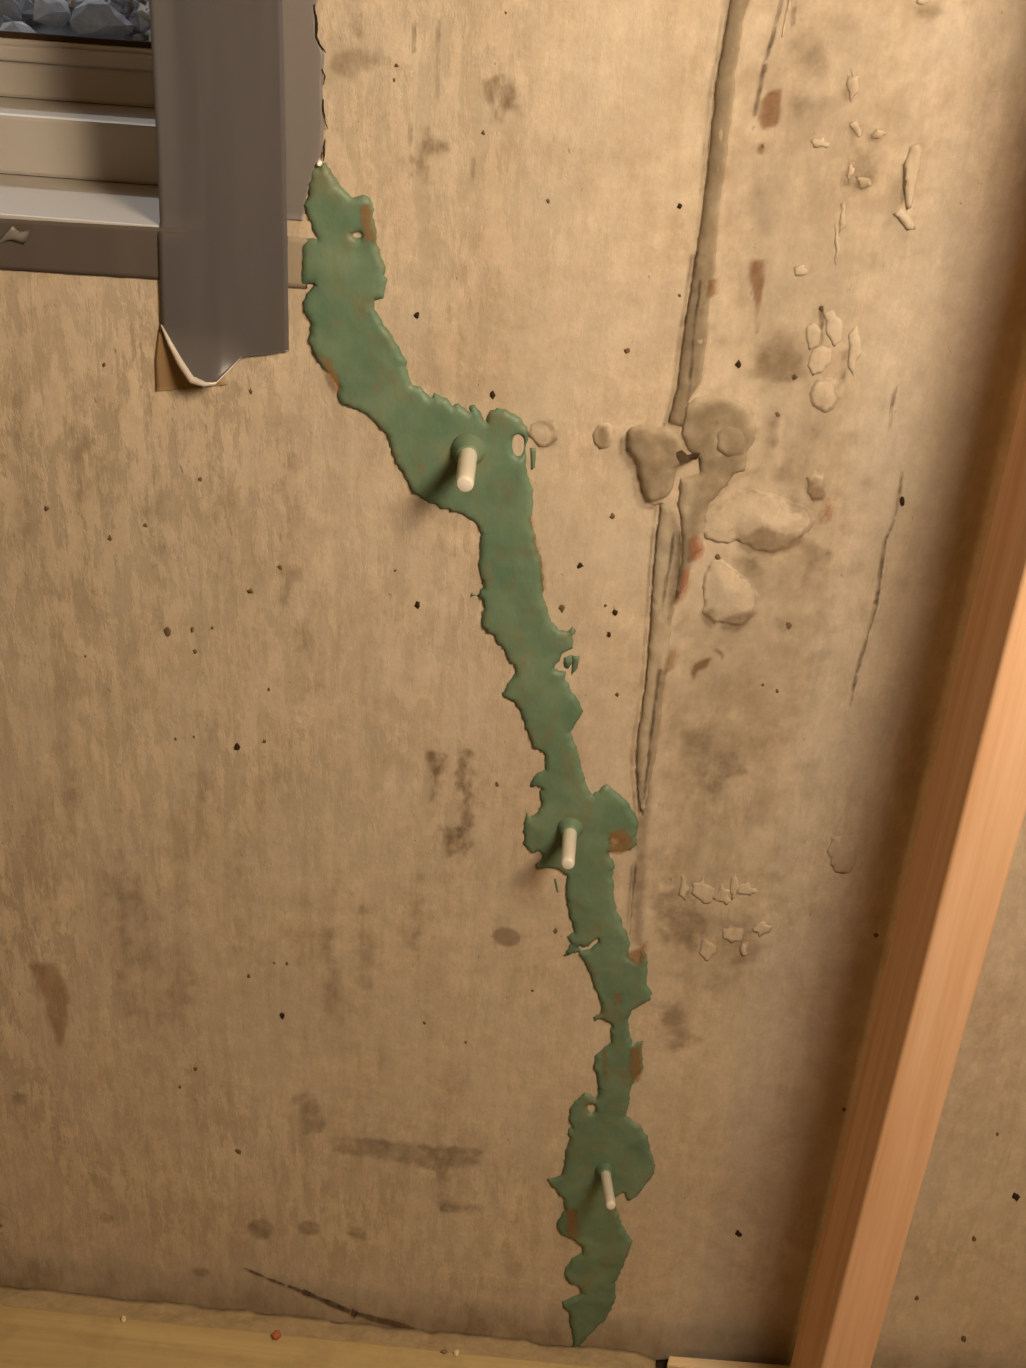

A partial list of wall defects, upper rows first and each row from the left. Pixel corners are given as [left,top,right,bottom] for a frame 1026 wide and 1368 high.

peeling [846,69,887,139]
peeling [806,307,862,376]
peeling [678,872,758,905]
peeling [699,921,773,961]
crack [246,1268,414,1329]